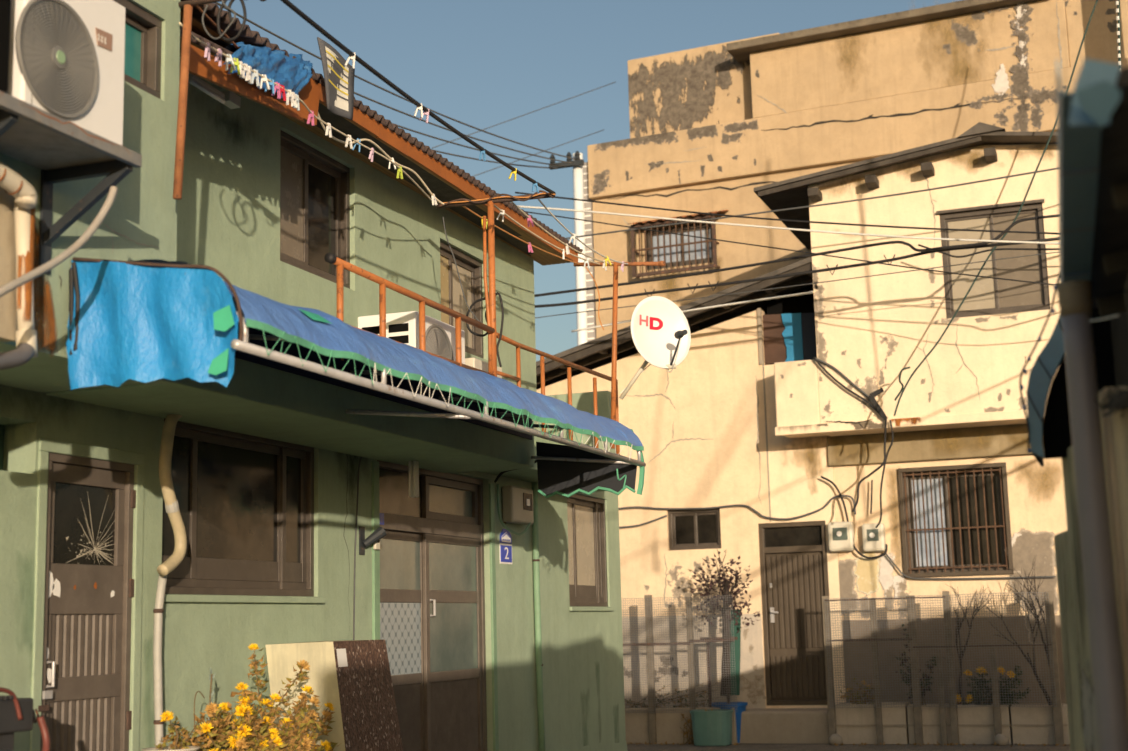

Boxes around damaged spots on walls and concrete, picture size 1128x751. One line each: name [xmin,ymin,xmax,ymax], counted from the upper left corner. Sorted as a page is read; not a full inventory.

peeling [591,169,613,195]
peeling [648,161,681,185]
peeling [594,45,760,177]
crack [760,96,1022,131]
peeling [943,2,1067,132]
rust [17,208,57,354]
crack [626,371,709,463]
crack [755,378,763,505]
peeling [797,264,899,430]
crack [916,324,980,402]